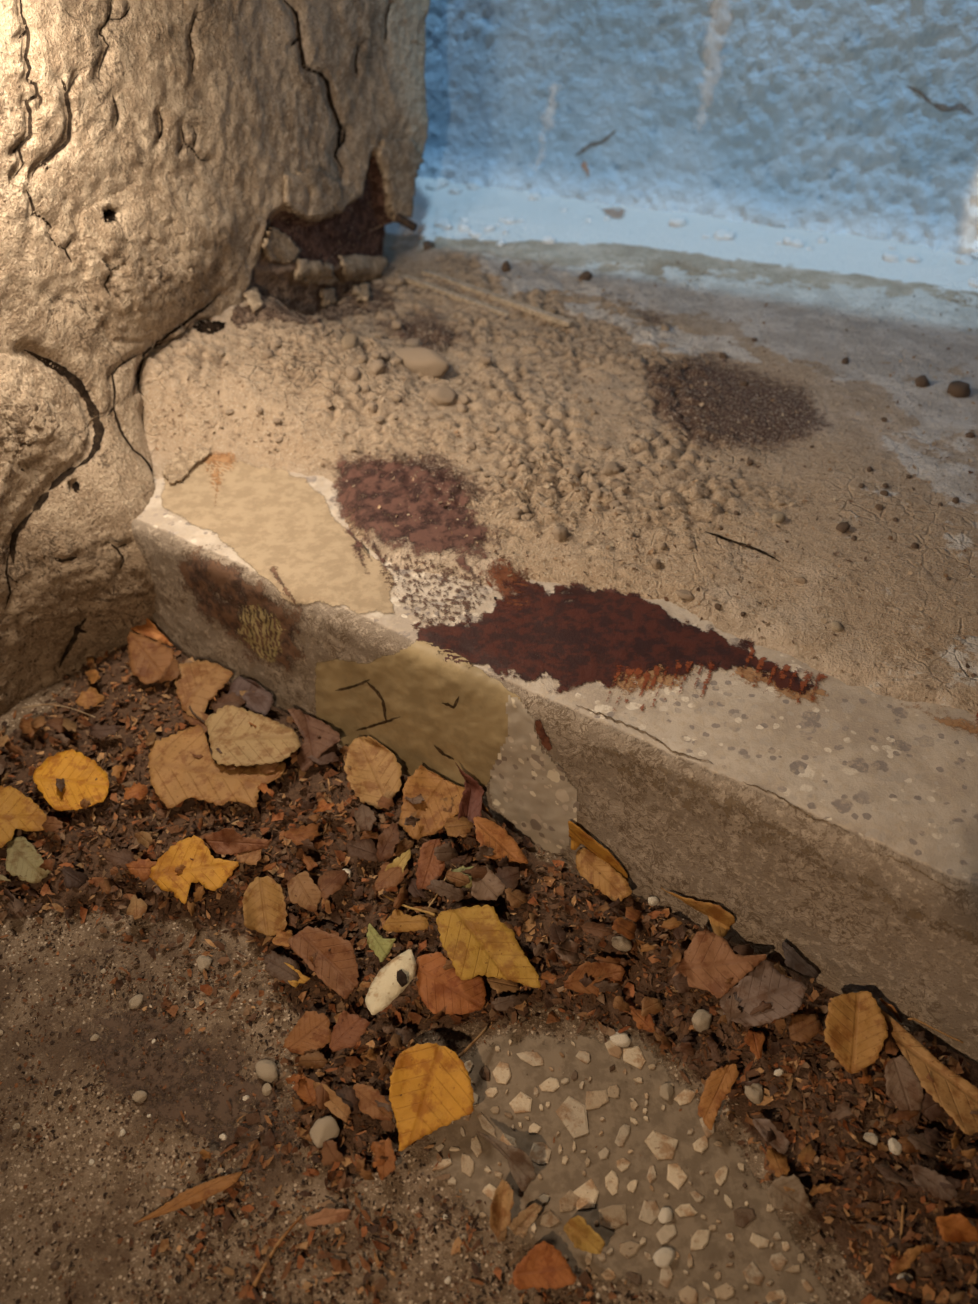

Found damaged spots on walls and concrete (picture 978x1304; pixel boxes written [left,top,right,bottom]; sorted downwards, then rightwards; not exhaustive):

crack [12,0,130,295]
spalling [230,138,424,328]
crack [284,0,392,181]
crack [5,292,221,608]
water stain [178,545,306,683]
rust [476,557,533,611]
crack [705,531,780,562]